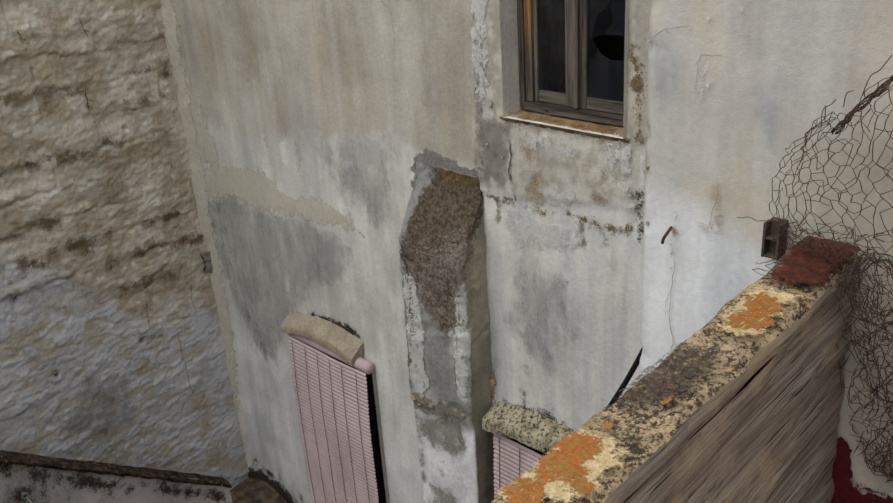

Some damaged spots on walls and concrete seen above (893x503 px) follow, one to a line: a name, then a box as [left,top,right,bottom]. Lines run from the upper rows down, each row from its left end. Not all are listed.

mould [627,45,647,144]
peeling [160,0,364,424]
mould [631,189,645,240]
crack [665,244,676,350]
damp [0,456,226,503]
peeling [851,478,893,499]